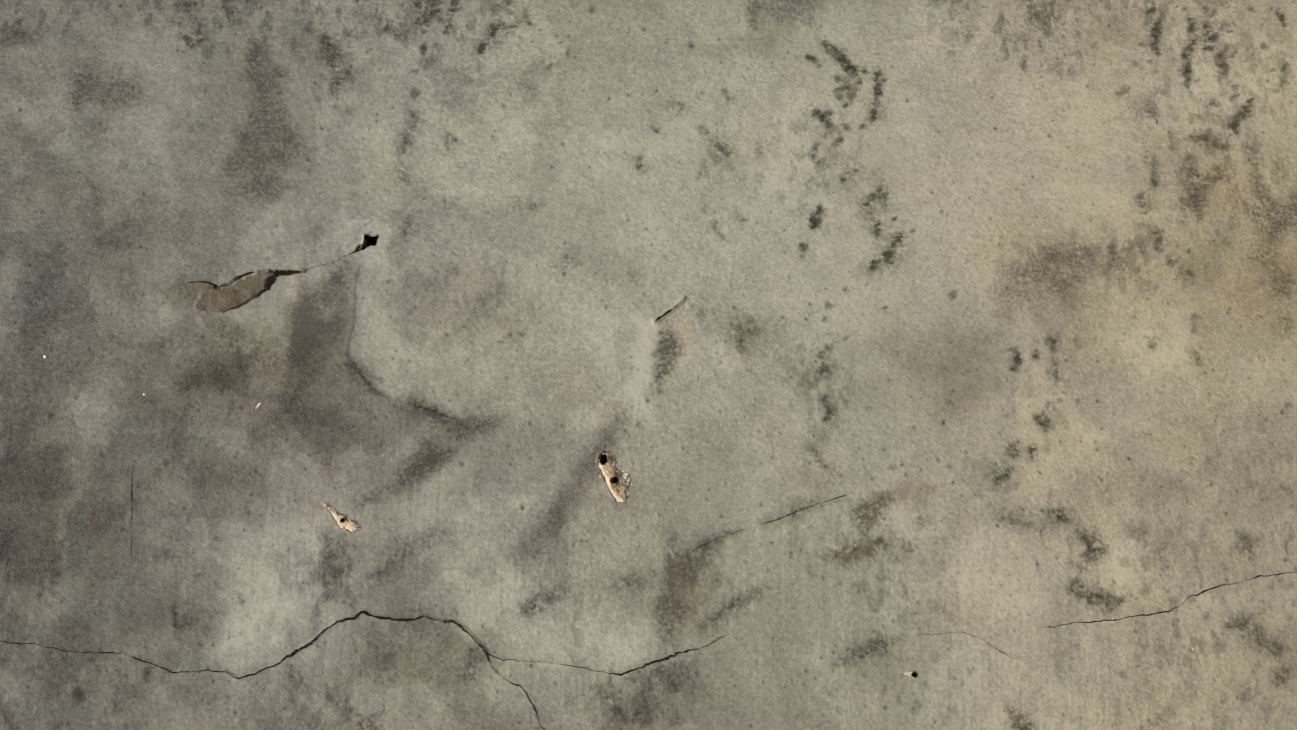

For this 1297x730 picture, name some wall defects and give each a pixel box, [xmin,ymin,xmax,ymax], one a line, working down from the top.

damp [806,41,887,143]
spalling [362,235,377,250]
damp [871,216,915,270]
spalling [175,271,277,312]
spalling [598,453,632,502]
spalling [322,502,360,532]
crack [1046,572,1291,628]
crack [0,611,723,730]